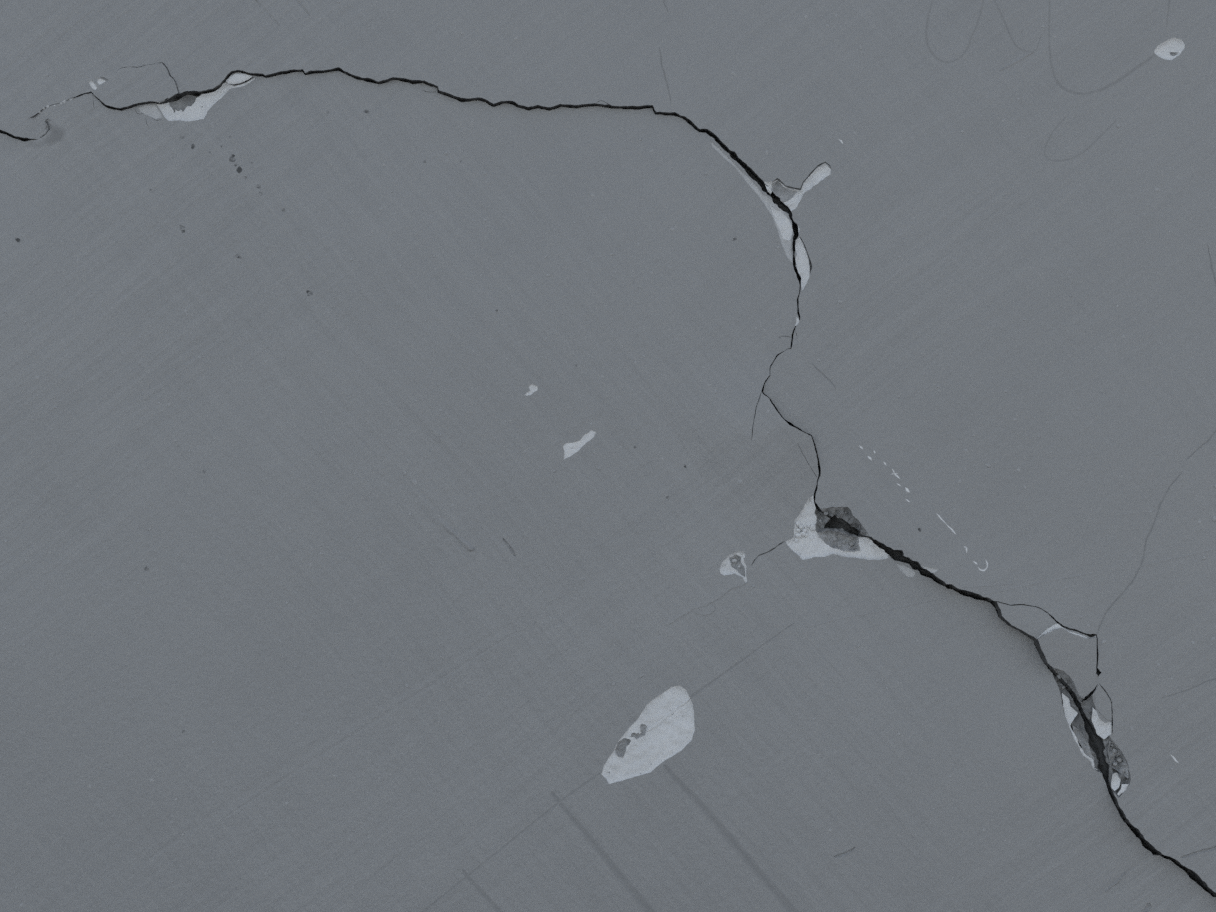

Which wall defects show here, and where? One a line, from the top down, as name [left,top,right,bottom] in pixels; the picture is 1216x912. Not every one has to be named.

flaking render [138,73,255,121]
flaking render [710,141,831,290]
crack [0,47,836,519]
flaking render [786,495,888,560]
crack [859,430,1216,897]
peeling [602,686,695,784]
flaking render [1053,668,1131,798]